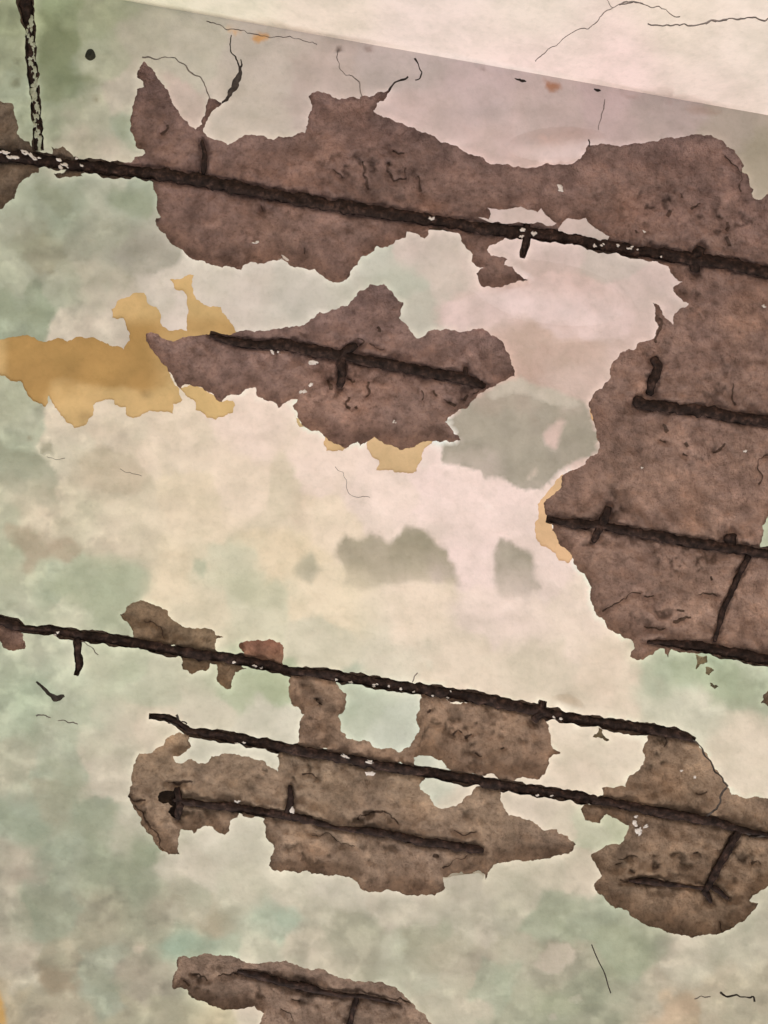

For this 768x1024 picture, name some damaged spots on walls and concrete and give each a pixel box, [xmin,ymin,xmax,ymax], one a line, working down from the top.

crack [142,21,362,103]
crack [515,0,768,82]
water stain [0,284,61,333]
spalling [0,62,768,689]
spalling [120,600,576,896]
spalling [581,734,768,938]
spalling [172,953,431,1024]